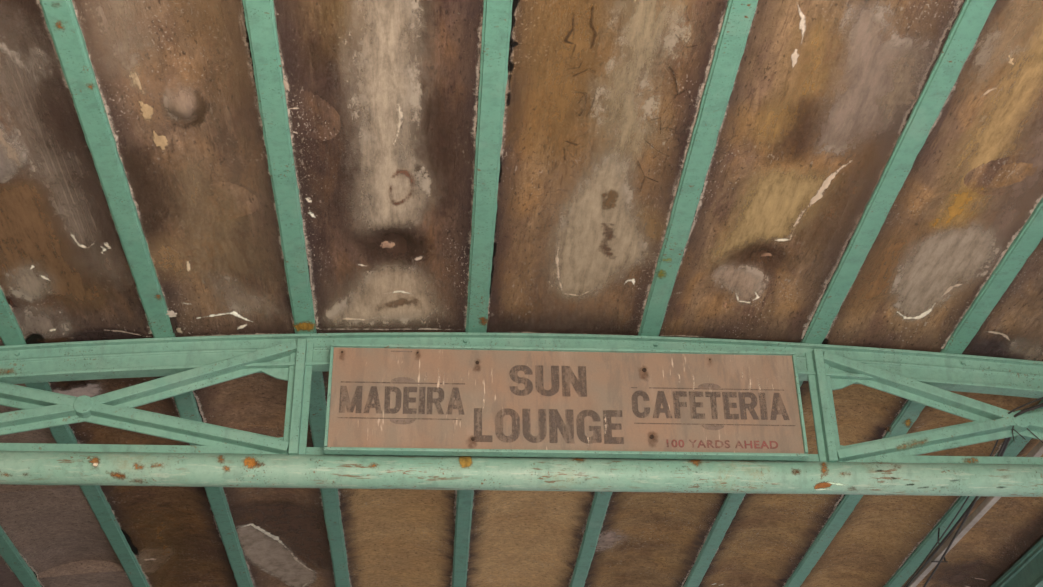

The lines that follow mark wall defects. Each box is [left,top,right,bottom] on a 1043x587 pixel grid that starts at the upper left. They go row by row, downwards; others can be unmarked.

water stain [0,0,151,342]
water stain [96,0,172,232]
water stain [319,0,457,330]
water stain [529,0,691,299]
water stain [713,4,930,309]
water stain [859,4,1043,319]
rust [244,457,263,468]